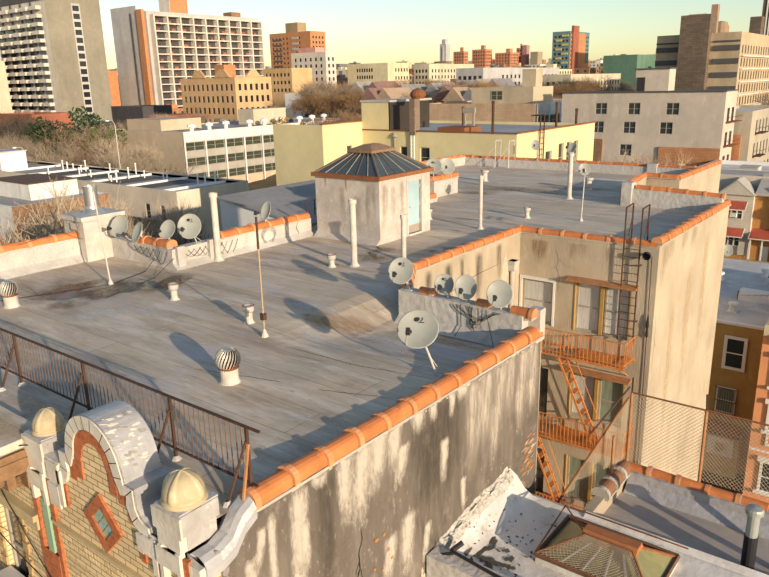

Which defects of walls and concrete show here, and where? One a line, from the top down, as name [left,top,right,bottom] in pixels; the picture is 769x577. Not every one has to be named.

peeling [99,411,149,466]
damp [338,427,407,513]
damp [413,344,537,494]
spalling [519,432,536,484]
damp [246,518,278,577]
damp [292,492,310,577]
damp [384,513,415,574]